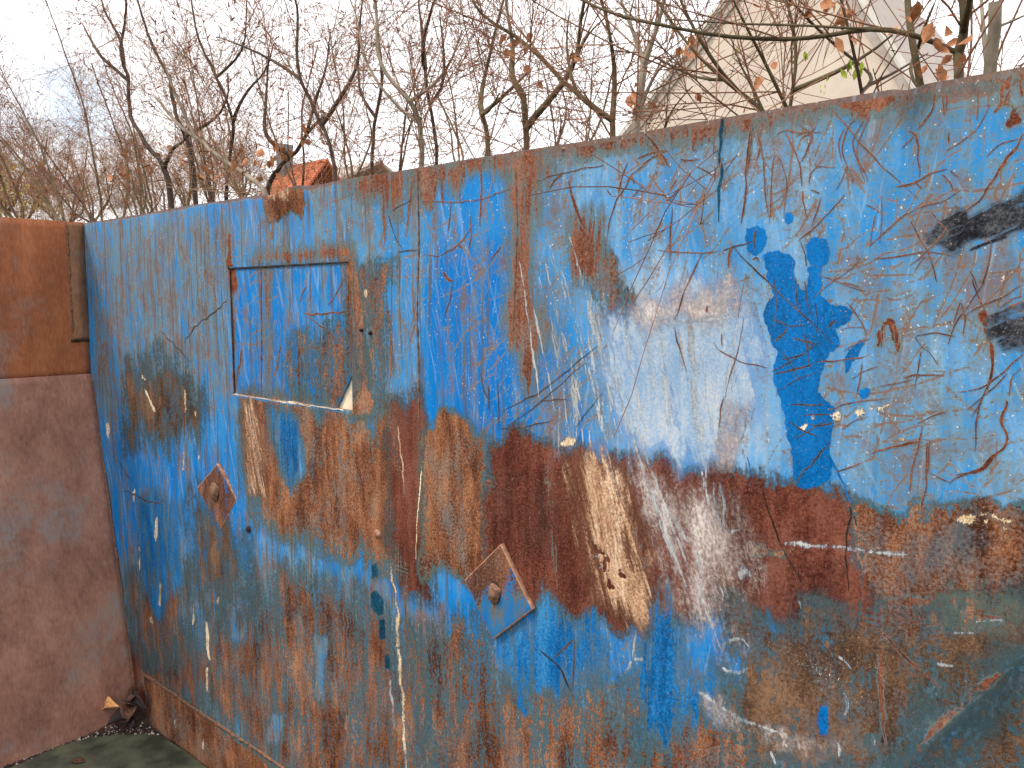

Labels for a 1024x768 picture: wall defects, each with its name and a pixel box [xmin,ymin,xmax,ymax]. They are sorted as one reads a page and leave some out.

rust [121,181,1024,768]
rust [341,74,1024,401]